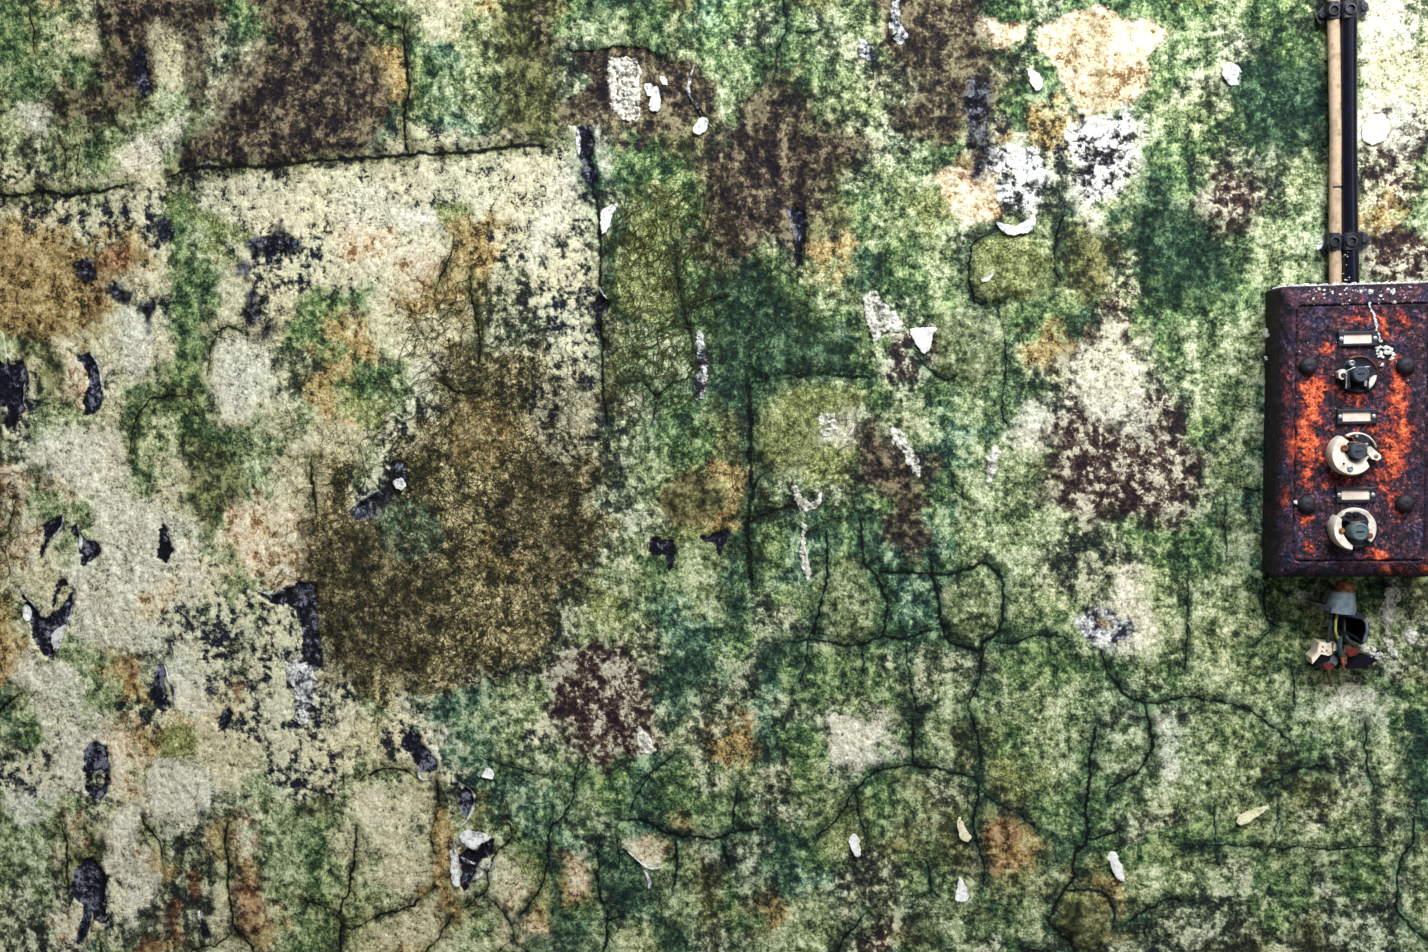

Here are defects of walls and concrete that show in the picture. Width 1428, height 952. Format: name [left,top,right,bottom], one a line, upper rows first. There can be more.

mould [41,0,399,187]
crack [166,0,548,190]
peeling [972,4,1168,198]
crack [581,135,755,425]
peeling [929,164,1036,236]
flaking render [14,512,101,660]
damp [285,378,607,726]
damp [543,637,659,763]
crack [787,514,1428,952]
peeling [72,757,206,944]
crack [297,751,590,952]
flaking render [450,768,494,891]